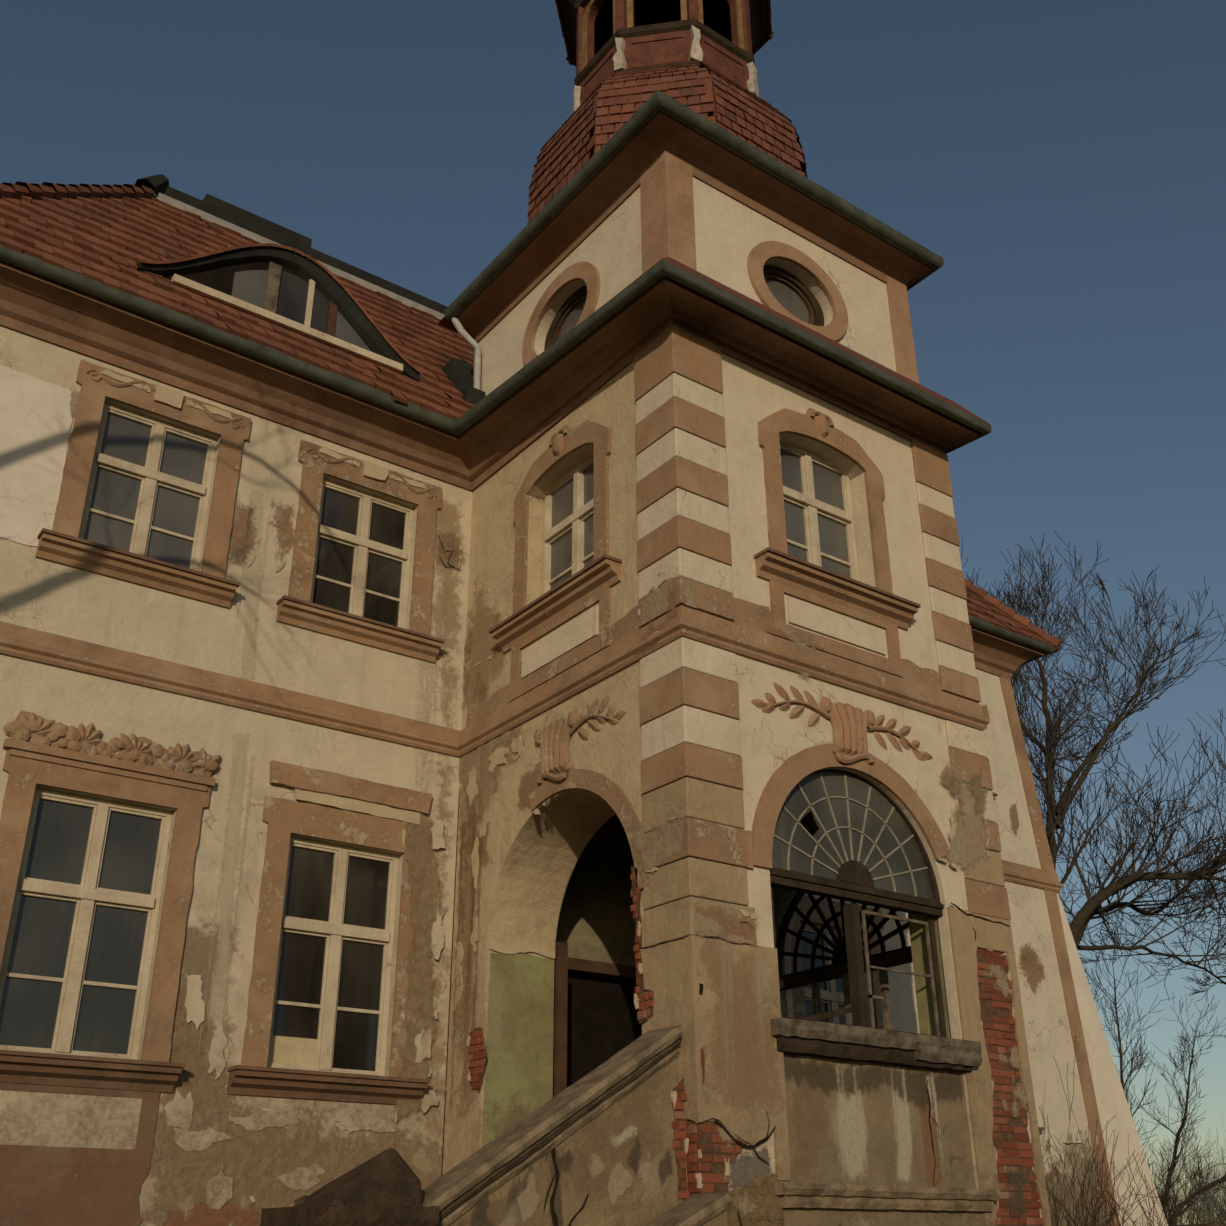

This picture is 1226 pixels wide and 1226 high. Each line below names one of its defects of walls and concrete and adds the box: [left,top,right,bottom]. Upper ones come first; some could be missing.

peeling [228,498,260,566]
peeling [270,499,295,572]
flaking render [936,764,990,869]
peeling [1009,800,1019,835]
peeling [630,810,684,1026]
flaking render [141,810,447,1226]
flaking render [467,1027,487,1093]
flaking render [976,944,1044,1226]
flaking render [671,1078,747,1201]
crack [715,1111,776,1165]
crack [543,1147,589,1226]